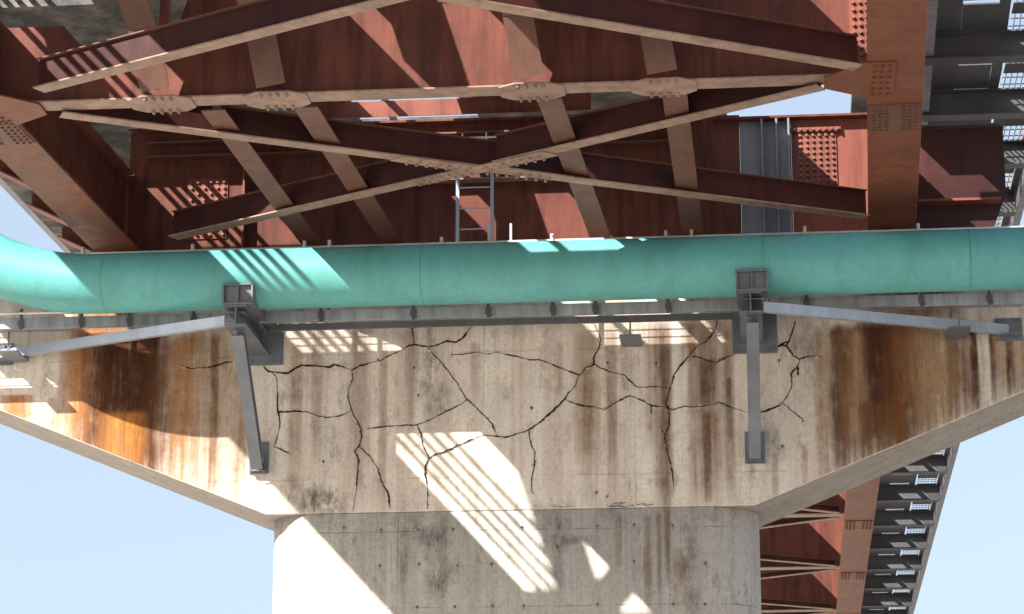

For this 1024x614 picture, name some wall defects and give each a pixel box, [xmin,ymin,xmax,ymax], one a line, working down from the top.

corrosion [4,395,26,418]
corrosion [64,313,220,480]
crack [183,361,233,369]
crack [263,319,822,509]
corrosion [816,292,978,458]
corrosion [989,334,1024,382]